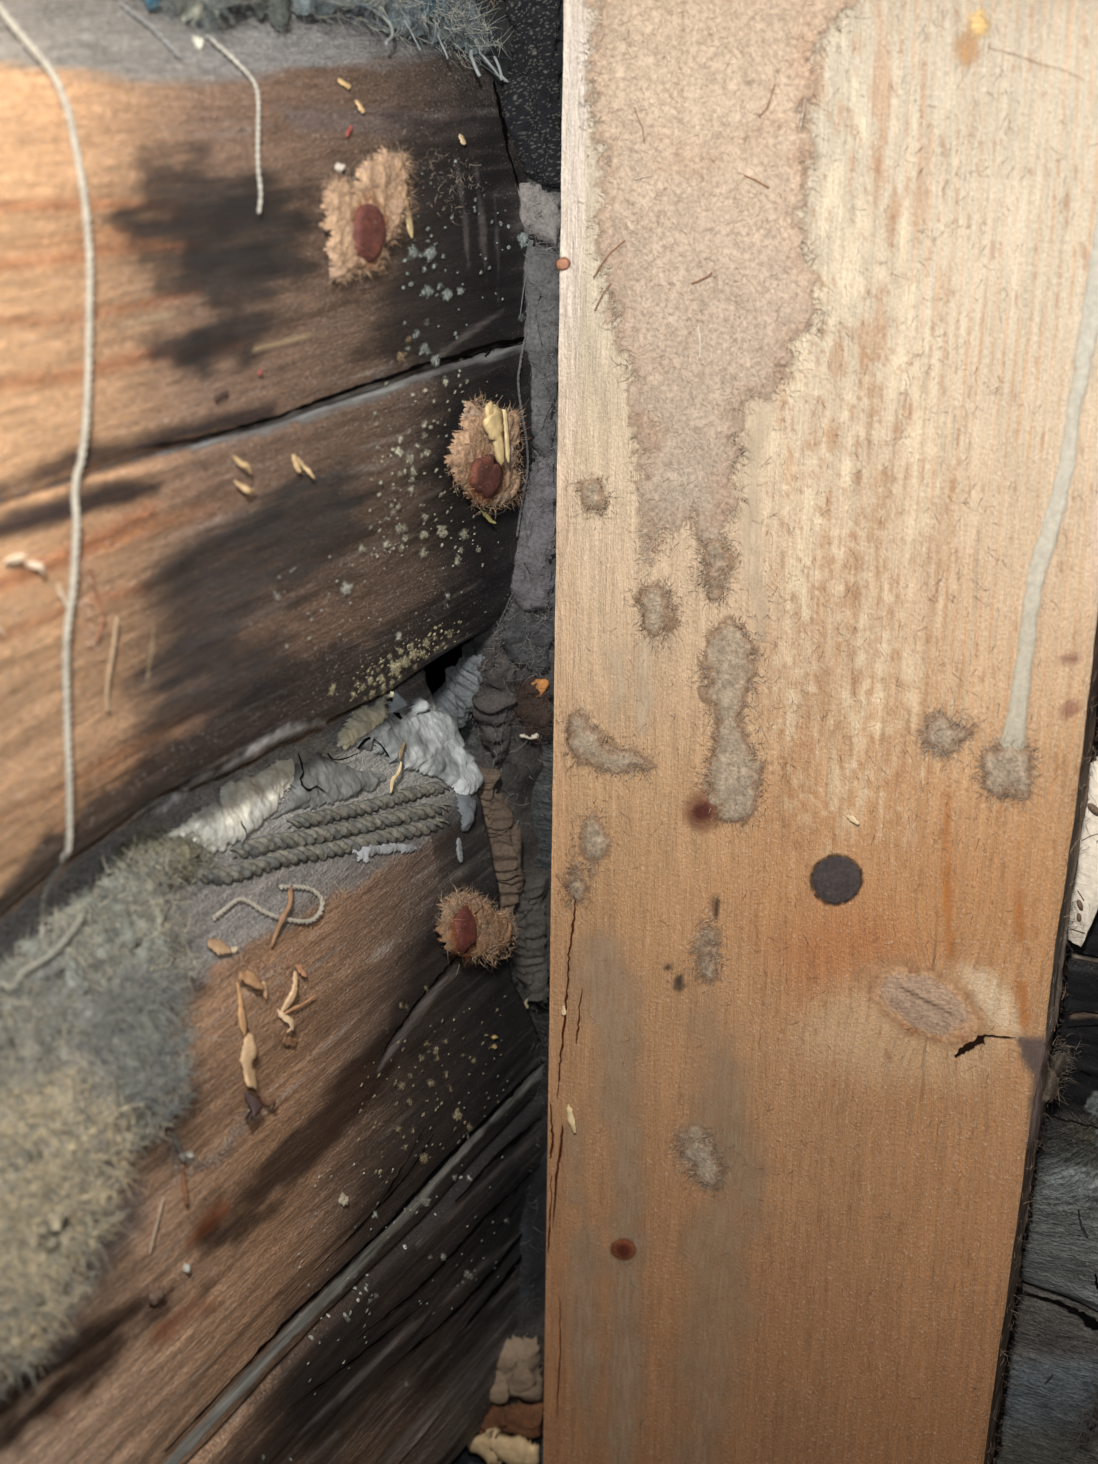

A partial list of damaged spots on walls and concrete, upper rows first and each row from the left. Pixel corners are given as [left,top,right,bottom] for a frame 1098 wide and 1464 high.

crack [954,1034,1016,1057]